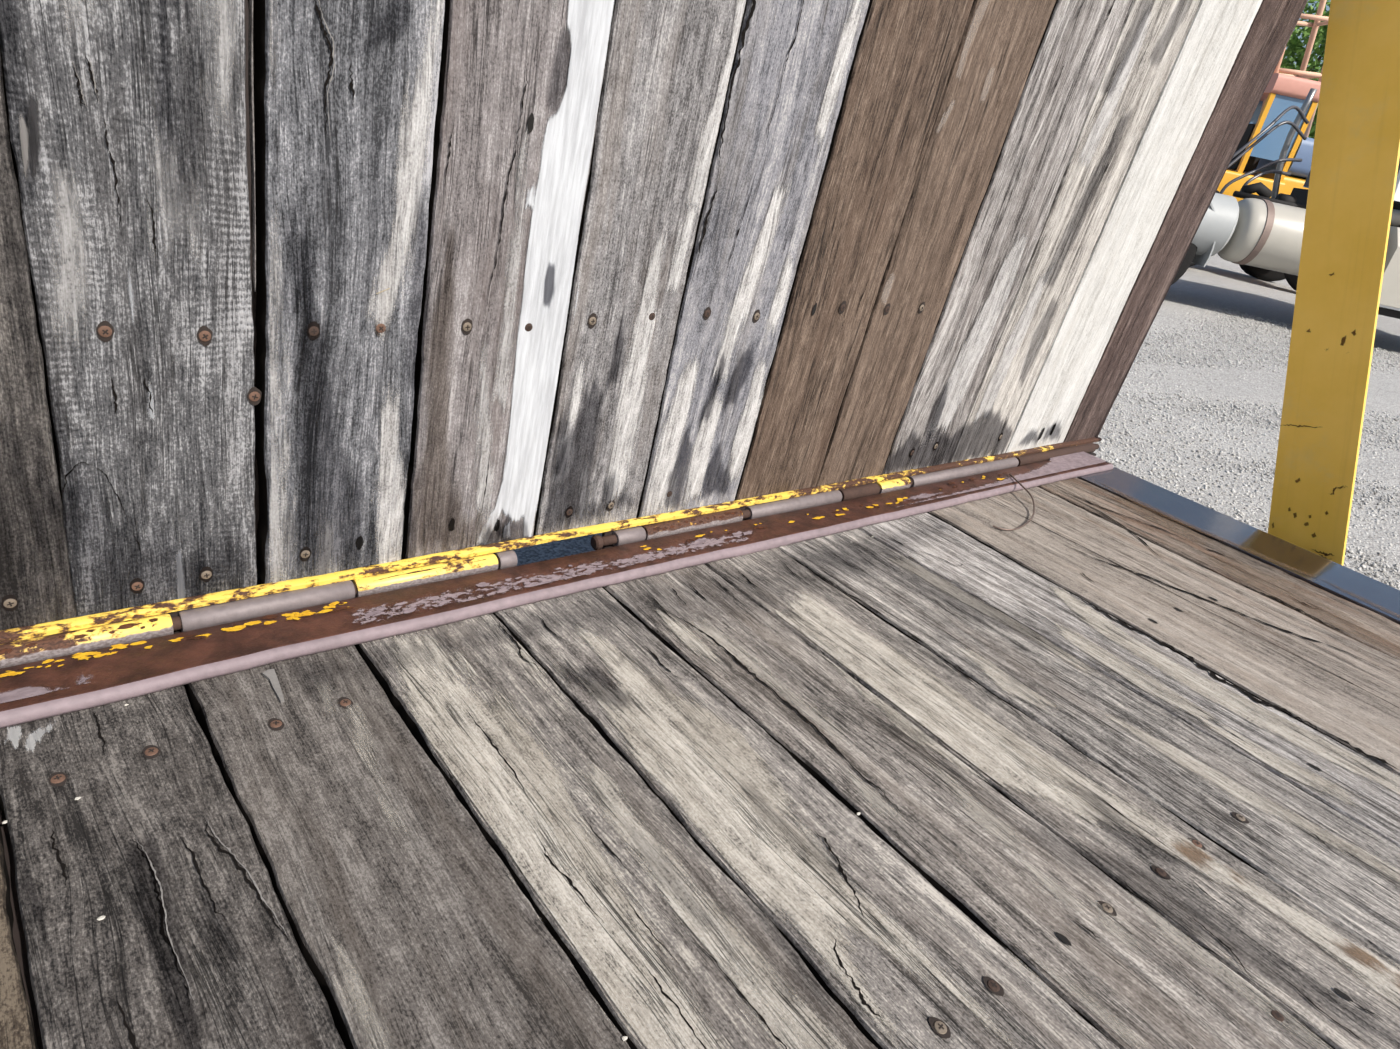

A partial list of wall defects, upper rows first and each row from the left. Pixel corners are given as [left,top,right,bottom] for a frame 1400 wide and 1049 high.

crack [315,0,355,139]
rust [653,511,742,531]
rust [59,618,158,639]
peeling [0,523,767,703]
crack [93,712,106,755]
crack [50,830,67,885]
crack [180,820,288,941]
crack [130,837,194,1010]
crack [117,996,139,1049]